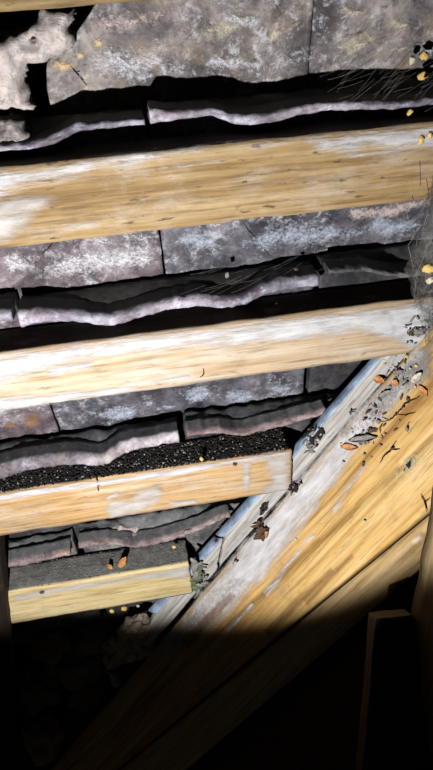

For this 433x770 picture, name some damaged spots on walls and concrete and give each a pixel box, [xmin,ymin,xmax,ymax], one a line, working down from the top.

water stain [206,15,254,37]
water stain [340,34,374,54]
water stain [92,39,160,75]
water stain [207,57,248,68]
water stain [254,200,430,248]
water stain [180,234,218,248]
water stain [4,253,26,272]
water stain [50,235,153,276]
water stain [0,303,433,658]